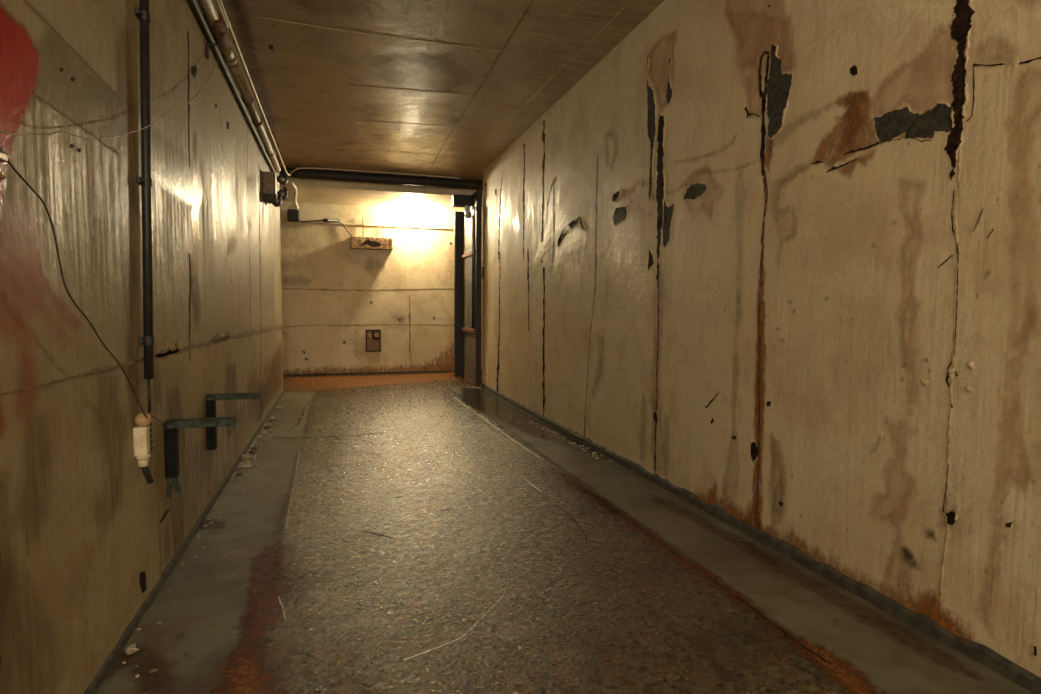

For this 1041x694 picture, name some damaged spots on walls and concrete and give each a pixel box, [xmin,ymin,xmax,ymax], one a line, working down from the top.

spalling [766,44,792,140]
spalling [874,0,975,180]
crack [967,57,1041,122]
peeling [557,216,586,247]
peeling [612,190,628,226]
crack [938,191,959,387]
corrosion [697,264,970,641]
crack [942,441,950,512]
corrosion [556,471,752,611]
corrosion [760,619,886,694]